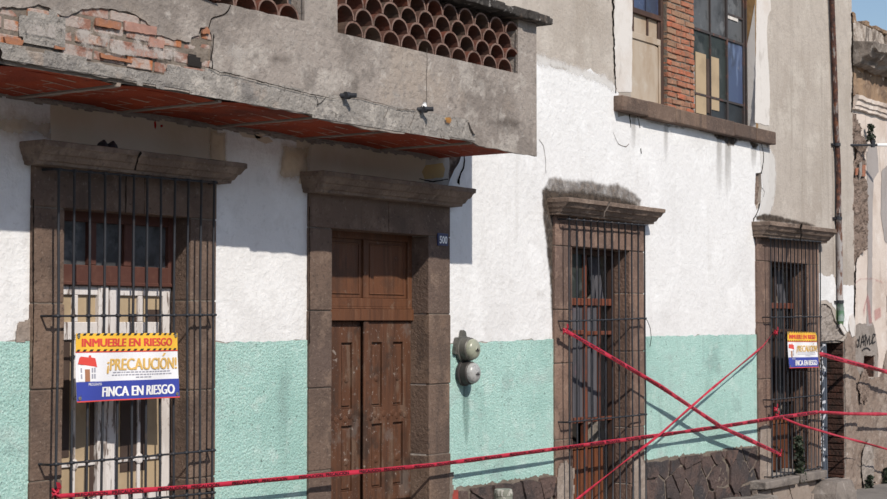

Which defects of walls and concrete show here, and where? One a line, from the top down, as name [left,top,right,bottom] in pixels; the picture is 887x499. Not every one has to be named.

spalling [3,9,66,50]
spalling [94,18,165,63]
hole [188,53,202,68]
crack [610,0,618,93]
crack [125,151,142,213]
spalling [852,112,869,266]